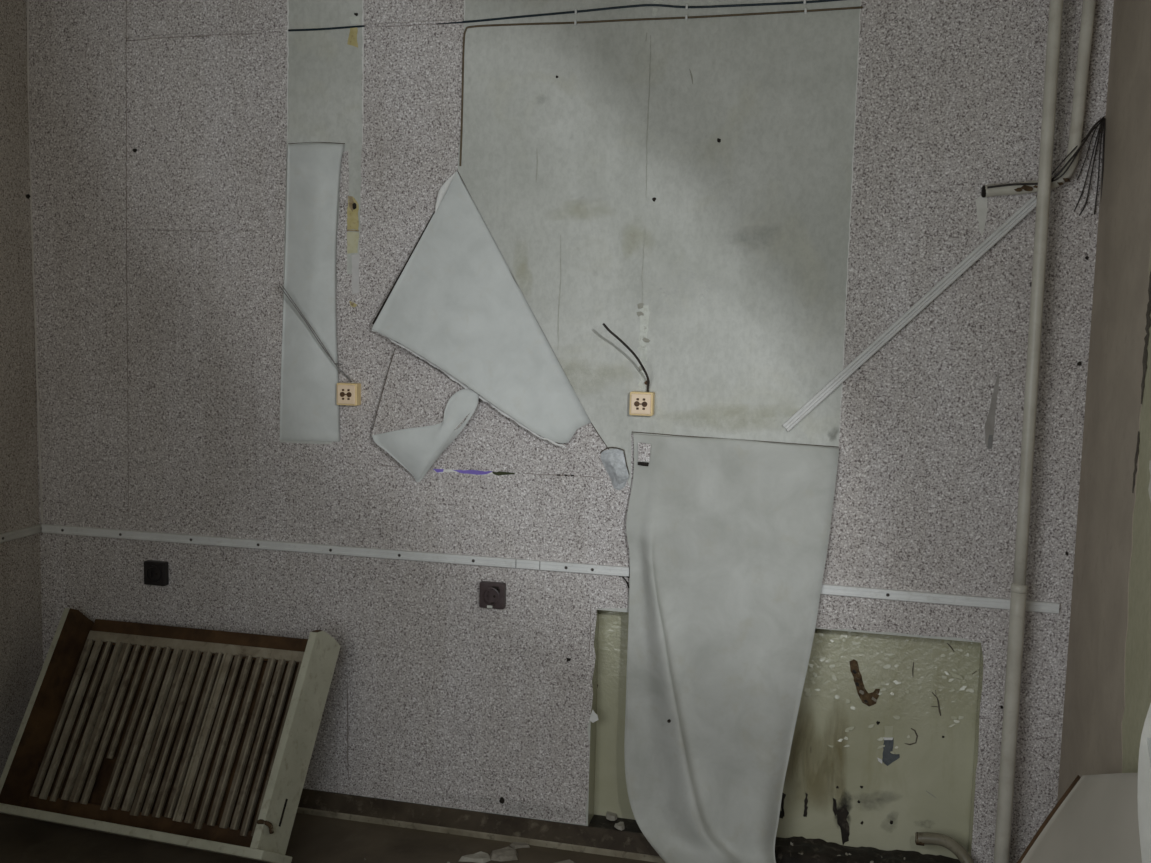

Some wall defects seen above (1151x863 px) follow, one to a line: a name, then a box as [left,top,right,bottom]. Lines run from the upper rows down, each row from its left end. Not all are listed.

peeling [280,0,364,442]
peeling [371,0,861,482]
peeling [984,373,999,449]
corrosion [849,659,880,706]
leakage [833,798,850,845]